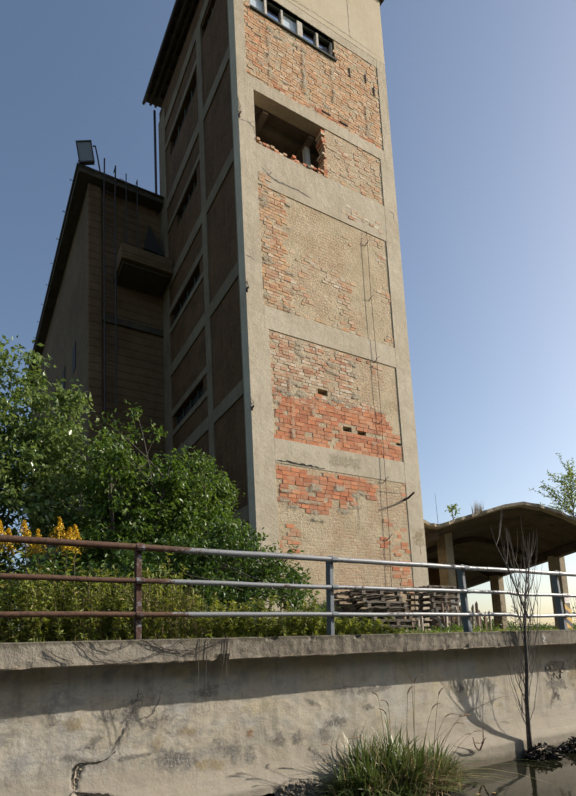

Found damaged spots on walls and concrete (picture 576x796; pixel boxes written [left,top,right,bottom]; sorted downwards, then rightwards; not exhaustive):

flaking render [244,3,383,204]
flaking render [258,171,361,336]
flaking render [270,332,403,462]
flaking render [276,465,379,522]
flaking render [377,519,414,593]
peeling [545,660,565,682]
spalling [72,765,95,796]
crack [70,690,175,796]